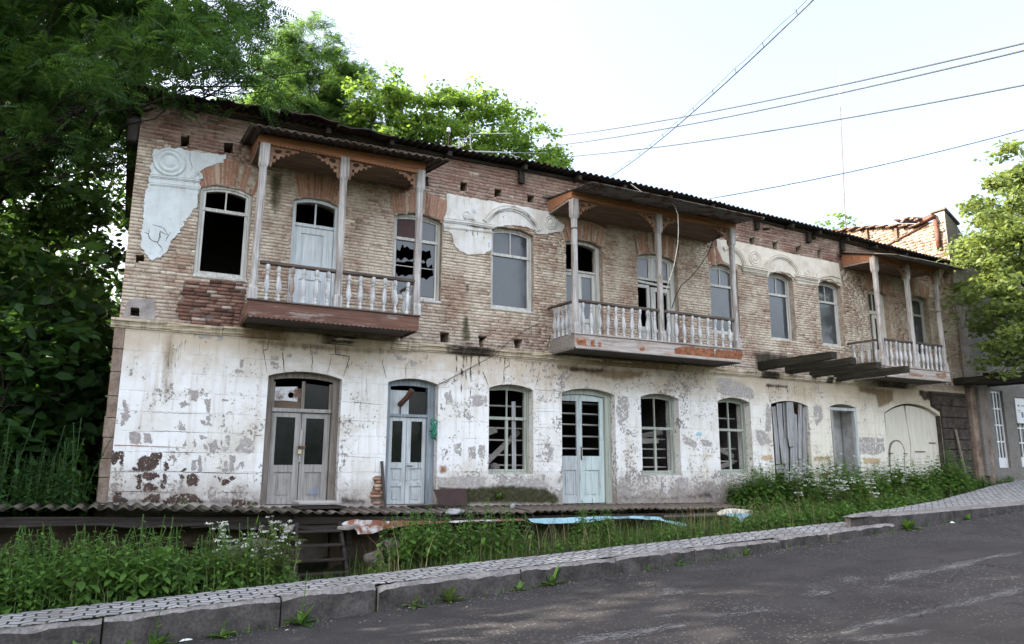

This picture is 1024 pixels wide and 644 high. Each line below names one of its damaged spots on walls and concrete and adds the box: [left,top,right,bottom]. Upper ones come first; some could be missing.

peeling [467,394,487,420]
peeling [616,395,629,425]
peeling [756,403,772,446]
peeling [813,406,823,426]
spalling [111,390,255,505]
peeling [453,443,485,459]
peeling [683,436,712,448]
peeling [859,437,885,456]
peeling [436,475,485,489]